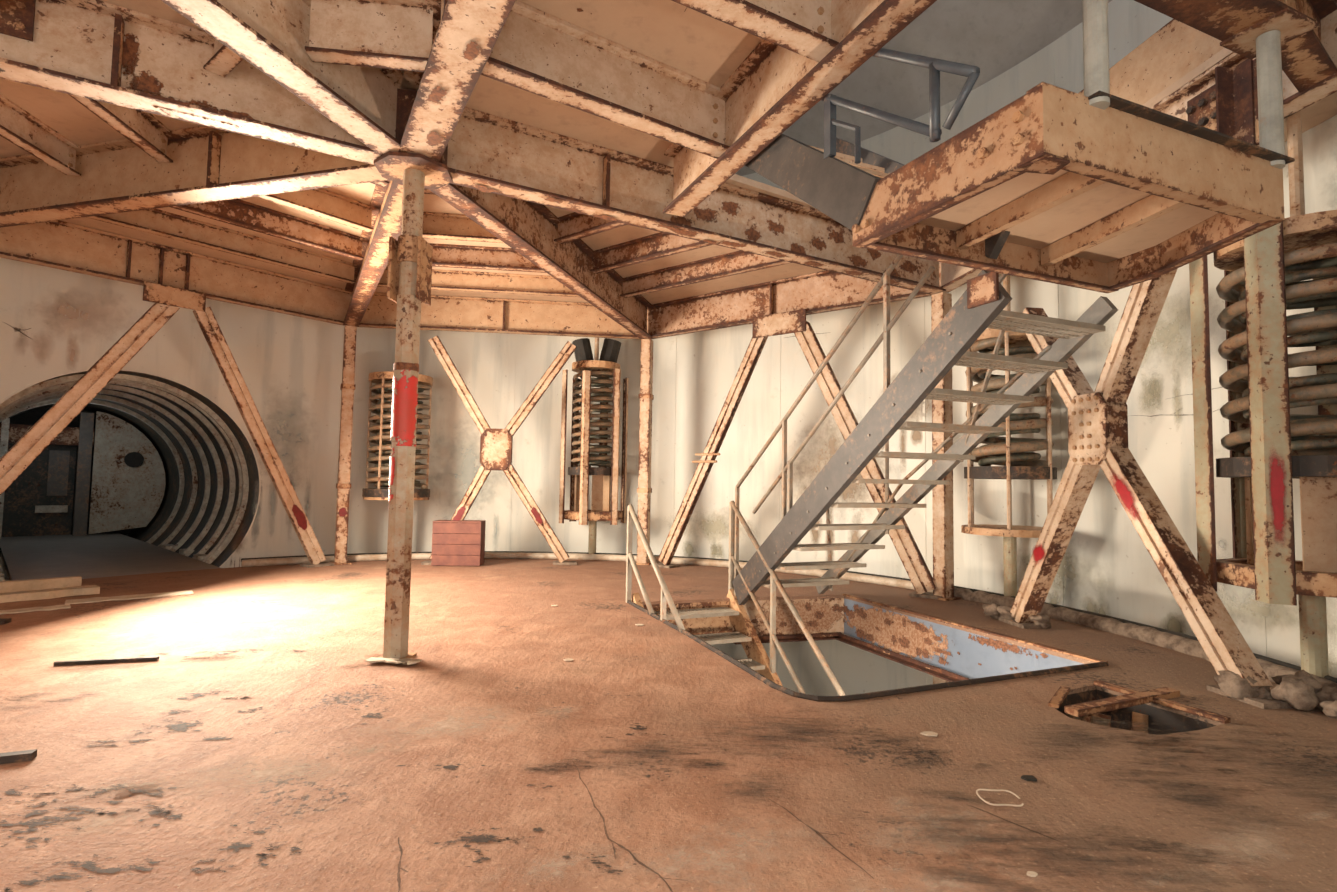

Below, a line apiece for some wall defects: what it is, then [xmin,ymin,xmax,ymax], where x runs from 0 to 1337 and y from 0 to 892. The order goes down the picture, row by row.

rust [462,41,482,63]
rust [426,84,448,104]
rust [426,132,444,148]
peeling [751,600,960,665]
peeling [968,634,1048,670]
crack [573,762,690,892]